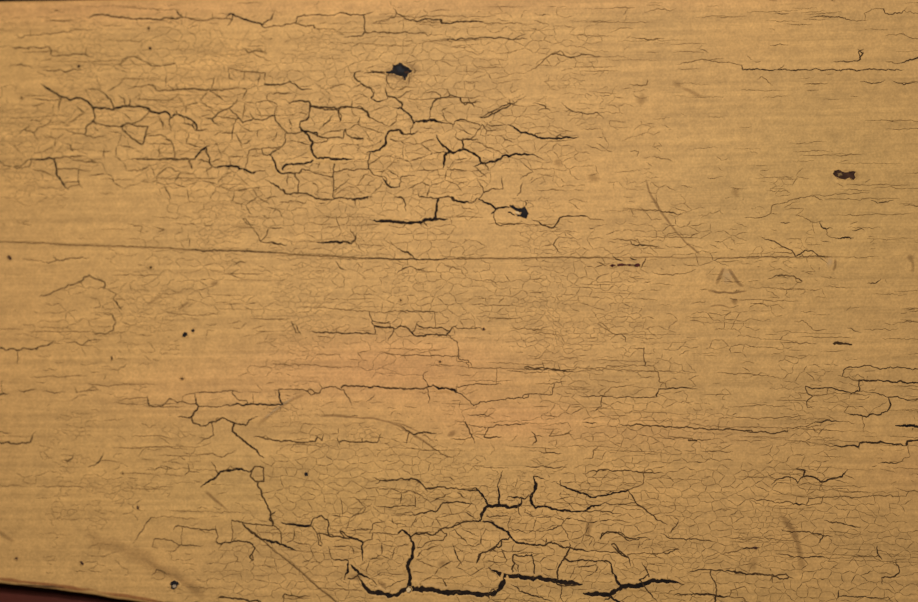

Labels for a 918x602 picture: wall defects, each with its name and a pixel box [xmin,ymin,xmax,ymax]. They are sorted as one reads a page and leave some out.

crack [610,7,669,40]
crack [0,8,603,272]
crack [0,256,122,361]
crack [596,238,695,276]
crack [0,307,918,602]